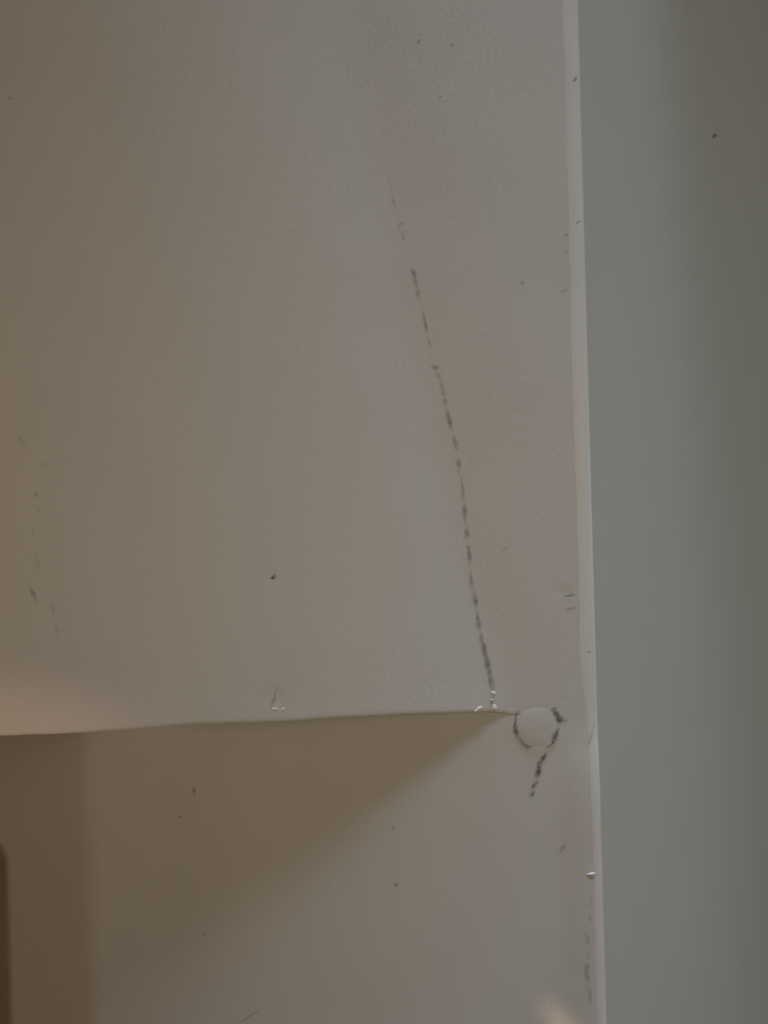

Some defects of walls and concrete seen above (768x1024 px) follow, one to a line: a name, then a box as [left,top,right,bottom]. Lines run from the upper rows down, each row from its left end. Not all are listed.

crack [533,712,562,787]